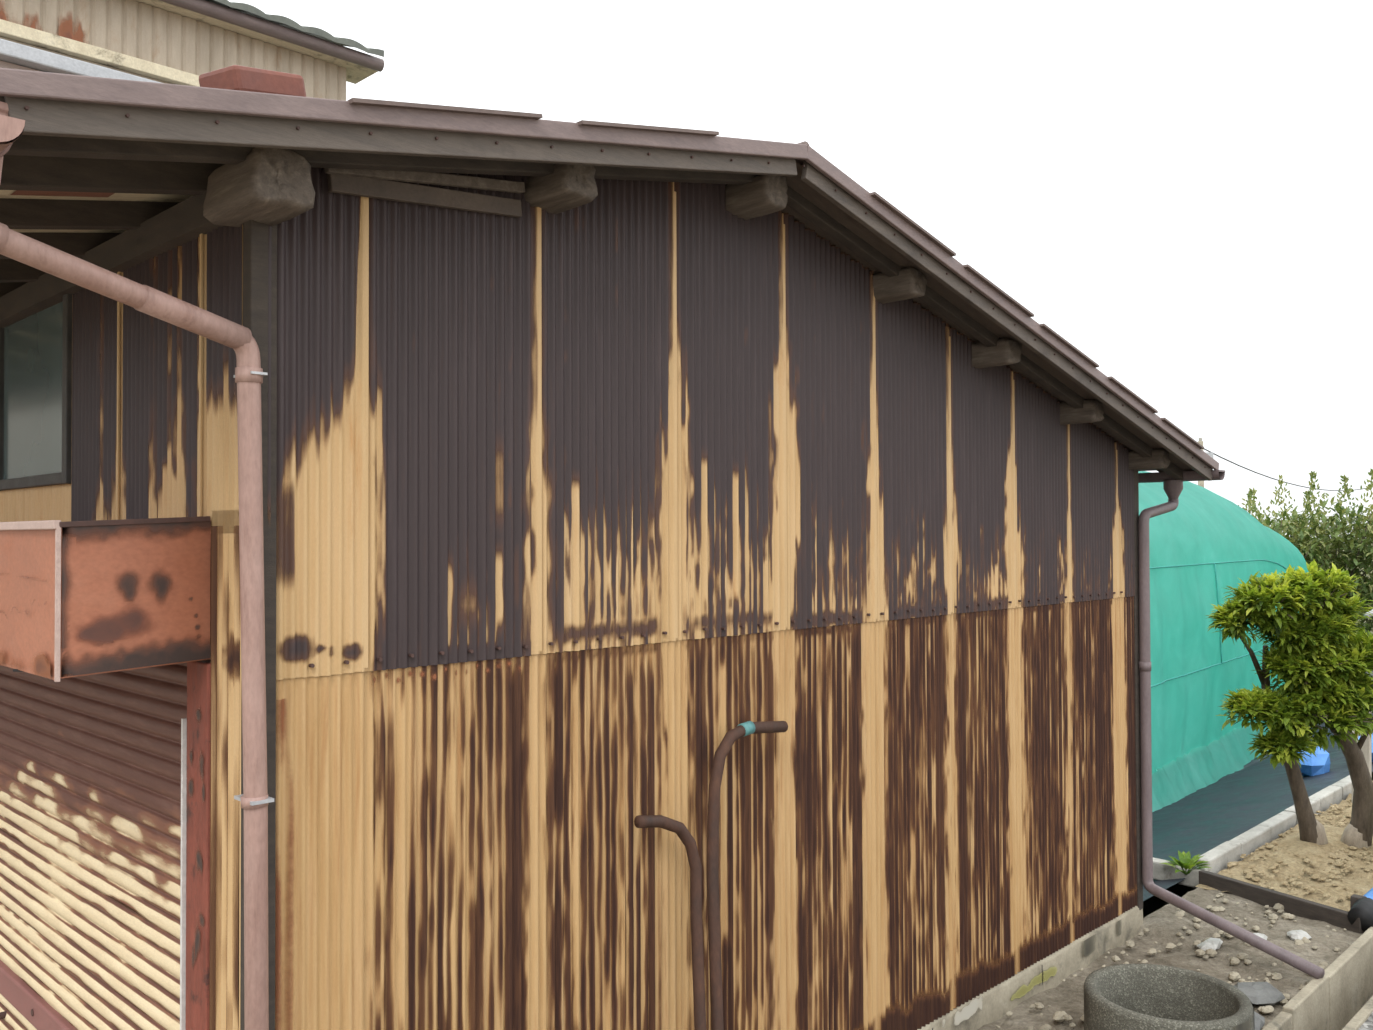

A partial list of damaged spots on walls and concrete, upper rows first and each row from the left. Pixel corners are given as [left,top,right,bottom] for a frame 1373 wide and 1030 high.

corrosion [0,289,240,1030]
corrosion [123,224,242,325]
corrosion [267,167,1137,1030]